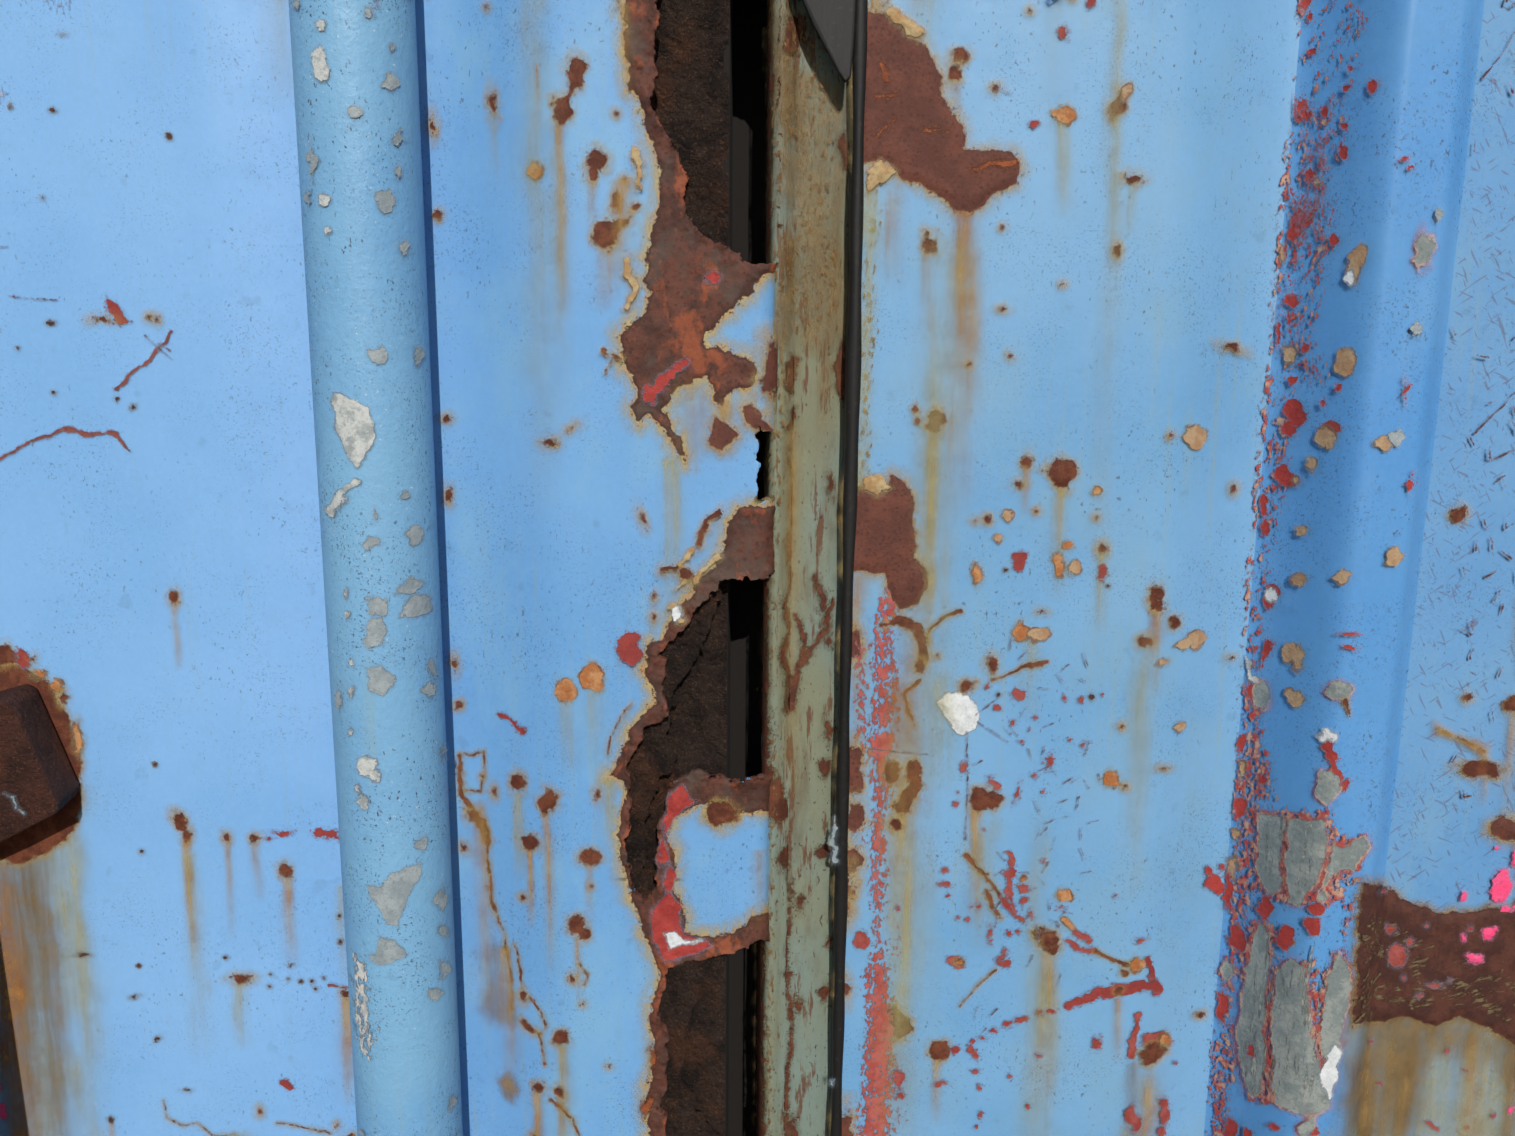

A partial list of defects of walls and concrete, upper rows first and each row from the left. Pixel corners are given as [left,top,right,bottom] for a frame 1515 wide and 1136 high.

corrosion [527,54,590,226]
peeling [323,392,376,518]
peeling [1166,424,1208,451]
peeling [343,576,433,648]
corrosion [707,0,1024,1136]
peeling [1156,614,1207,667]
peeling [1195,0,1382,1136]
corrosion [0,643,83,865]
peeling [368,837,428,965]
corrosion [480,773,559,902]
corrosion [1349,877,1515,1047]
corrosion [1117,1000,1174,1068]